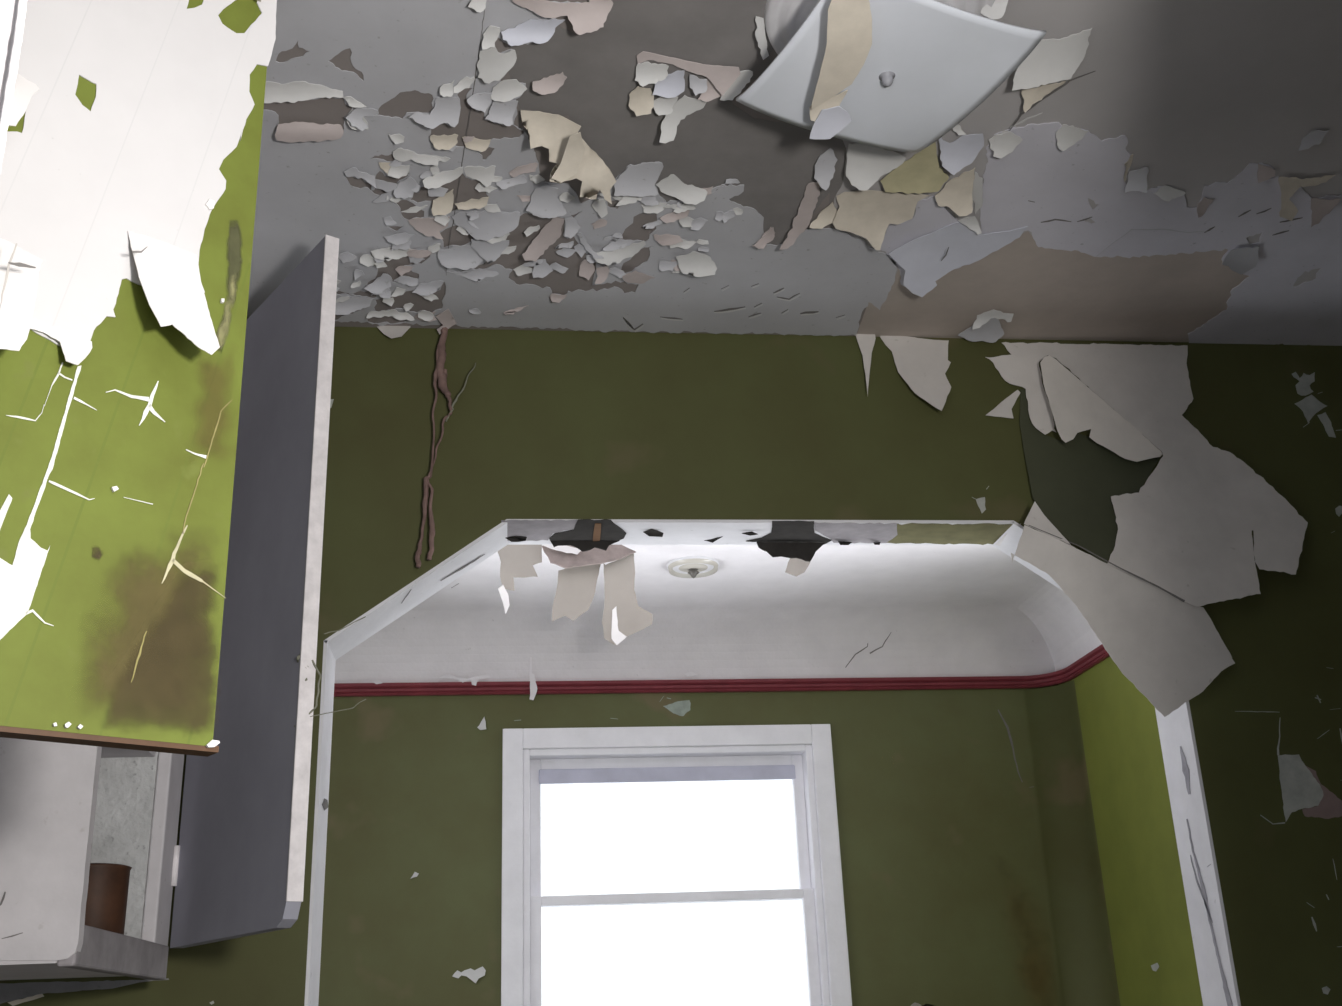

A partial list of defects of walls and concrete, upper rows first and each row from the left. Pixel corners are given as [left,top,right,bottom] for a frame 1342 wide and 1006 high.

peeling [0,0,1342,365]
crack [6,362,165,426]
crack [48,480,153,505]
crack [161,400,232,599]
peeling [972,486,989,513]
spalling [543,519,626,554]
spalling [644,529,663,537]
spalling [742,520,852,562]
crack [131,631,147,683]
leakage [95,551,213,729]